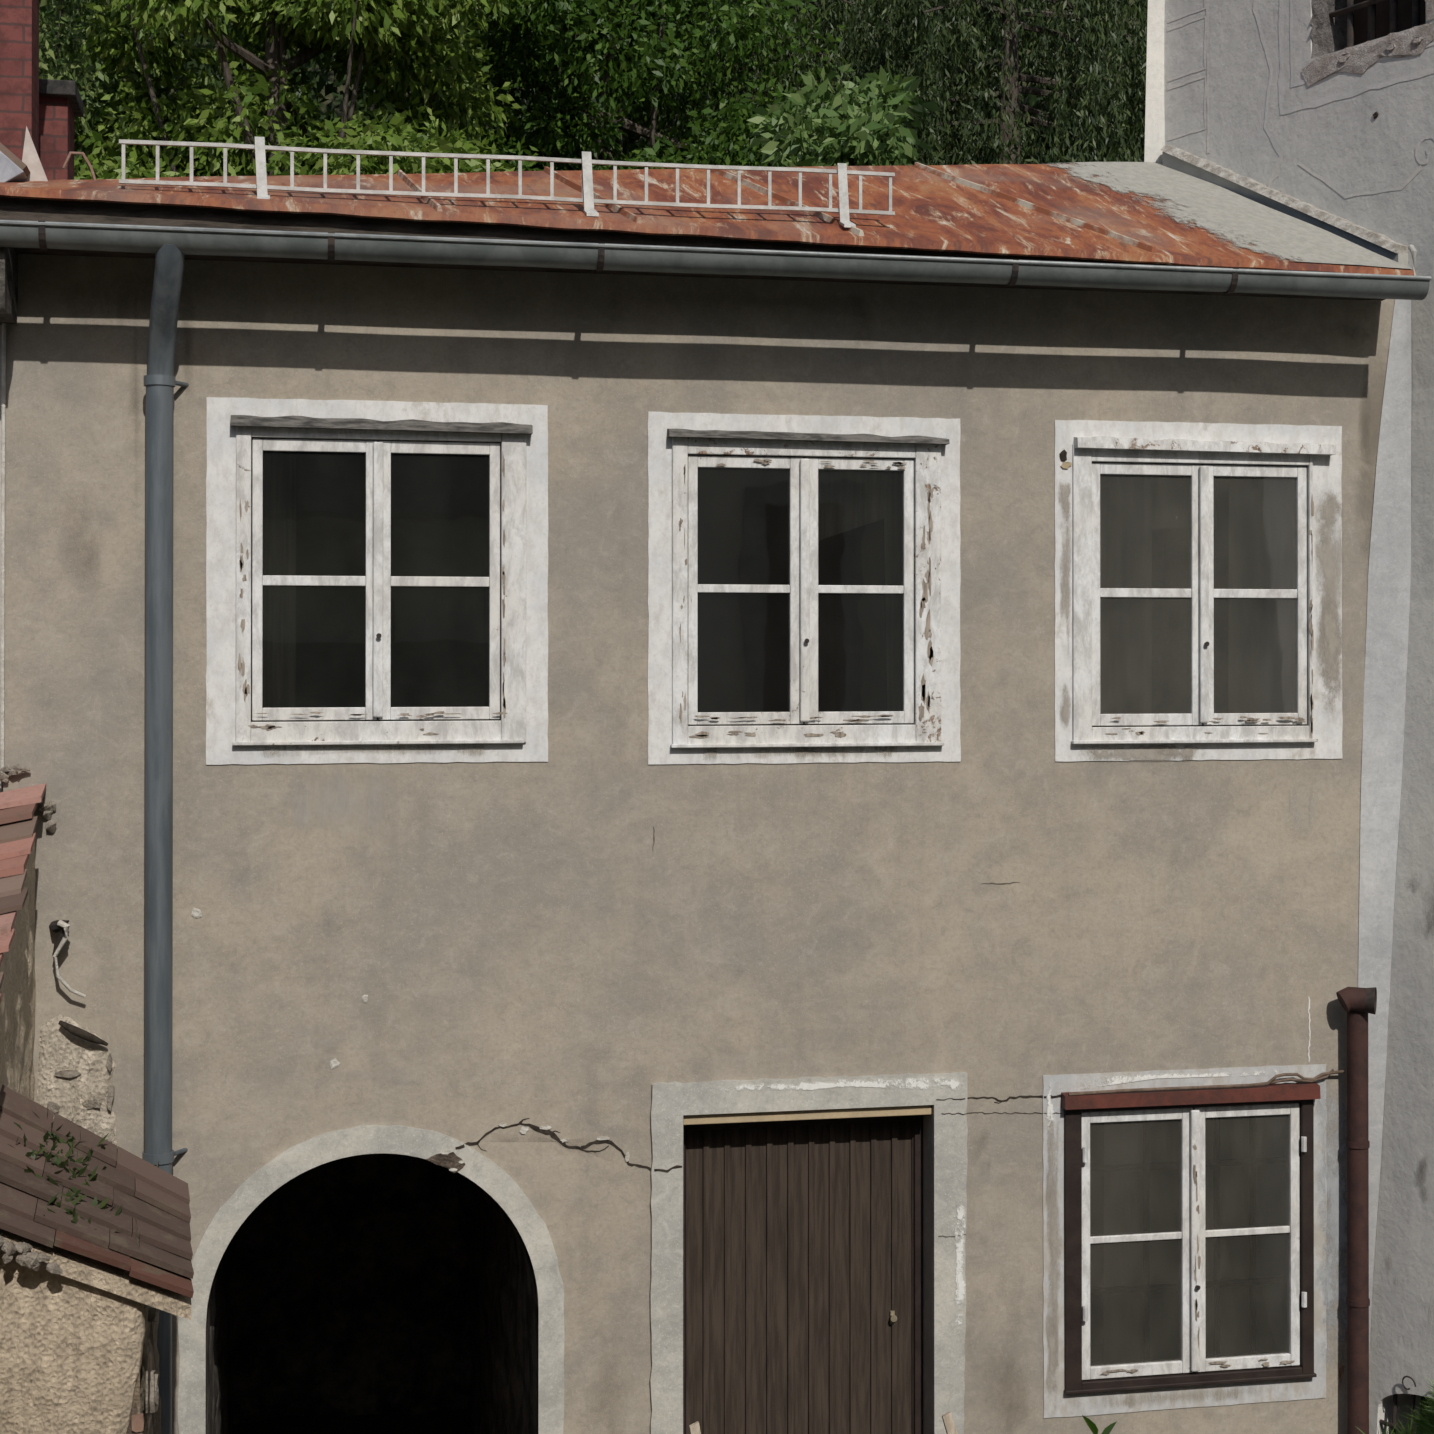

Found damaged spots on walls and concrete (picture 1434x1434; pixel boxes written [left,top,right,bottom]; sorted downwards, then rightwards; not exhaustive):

peeling [918,488,934,721]
crack [936,1094,1062,1115]
spalling [426,1150,466,1173]
crack [455,1118,682,1173]
spalling [126,1308,159,1434]